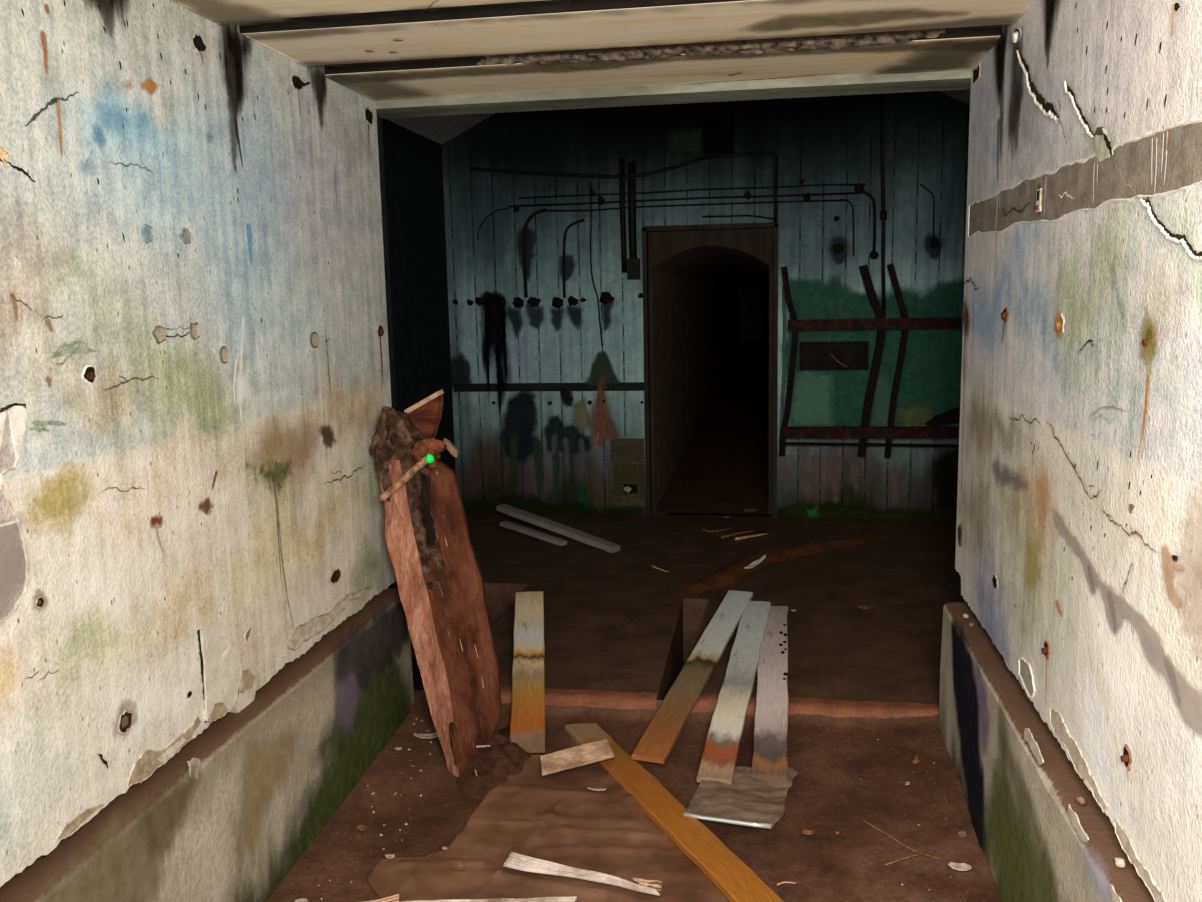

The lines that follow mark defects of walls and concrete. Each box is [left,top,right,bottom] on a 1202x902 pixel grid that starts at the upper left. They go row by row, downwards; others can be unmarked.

rust [1171,3,1180,36]
crack [25,92,79,126]
crack [1016,48,1113,162]
peeling [968,117,1202,238]
crack [1140,196,1202,262]
crack [1105,243,1125,332]
rust [1138,317,1156,463]
flaking render [0,402,28,622]
crack [1009,414,1158,594]
flaking render [55,801,107,843]
flaking render [126,714,202,788]
flaking render [1049,706,1167,902]